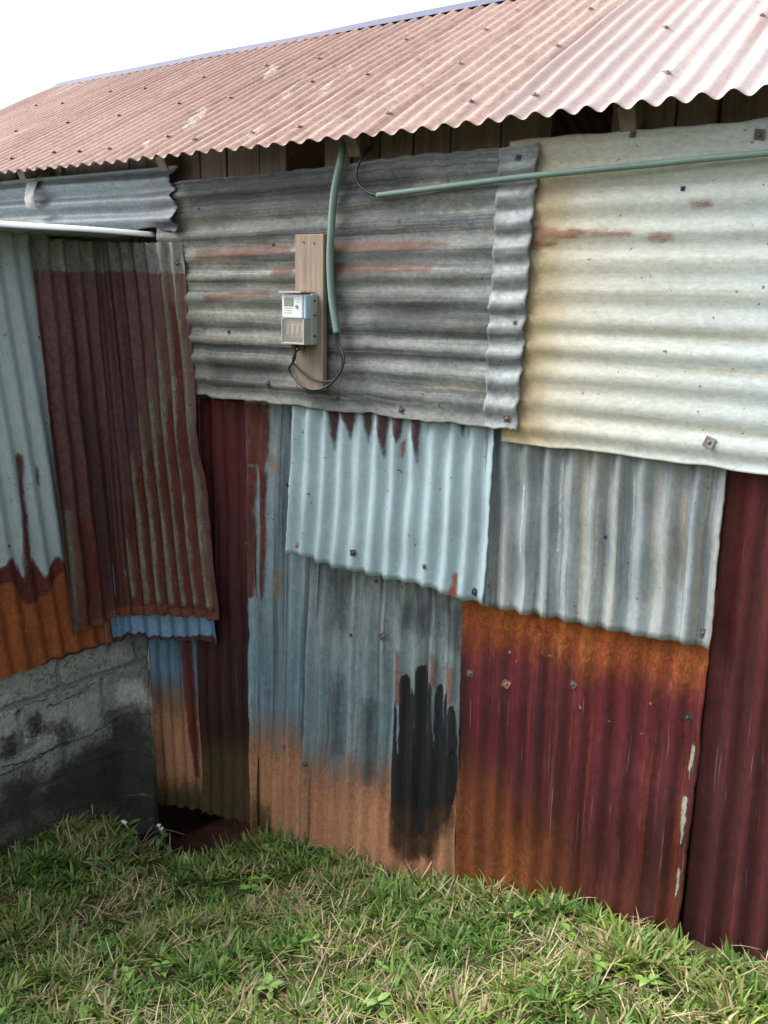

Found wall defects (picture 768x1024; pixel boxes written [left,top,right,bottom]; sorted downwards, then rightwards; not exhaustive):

corrosion [0,303,219,778]
corrosion [245,403,276,598]
corrosion [327,411,420,455]
corrosion [450,574,711,683]
damp [0,680,271,857]
corrosion [455,768,561,898]